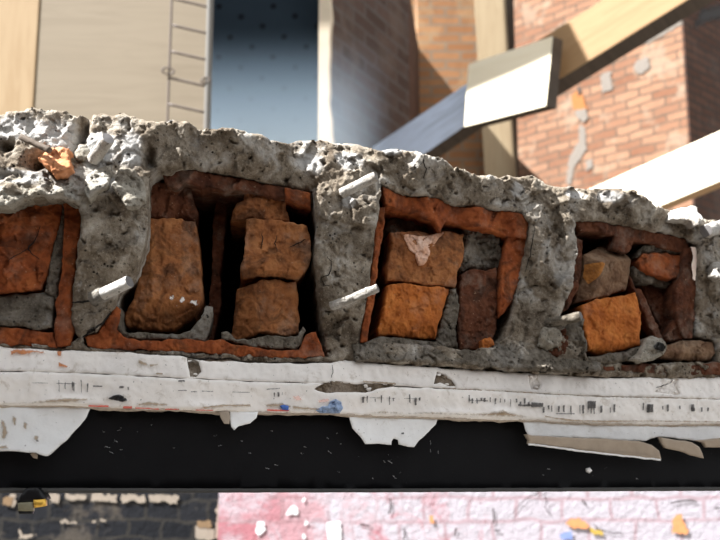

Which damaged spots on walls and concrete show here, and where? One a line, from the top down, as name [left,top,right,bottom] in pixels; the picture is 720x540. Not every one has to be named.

spalling [0,204,63,296]
spalling [124,182,207,334]
spalling [231,194,311,340]
spalling [367,230,498,351]
spalling [560,245,715,364]
spalling [315,381,395,393]
peeling [0,407,90,459]
peeling [349,417,437,447]
peeling [523,422,720,461]
peeling [3,494,16,507]
peeling [49,493,179,504]
peeling [195,499,219,540]